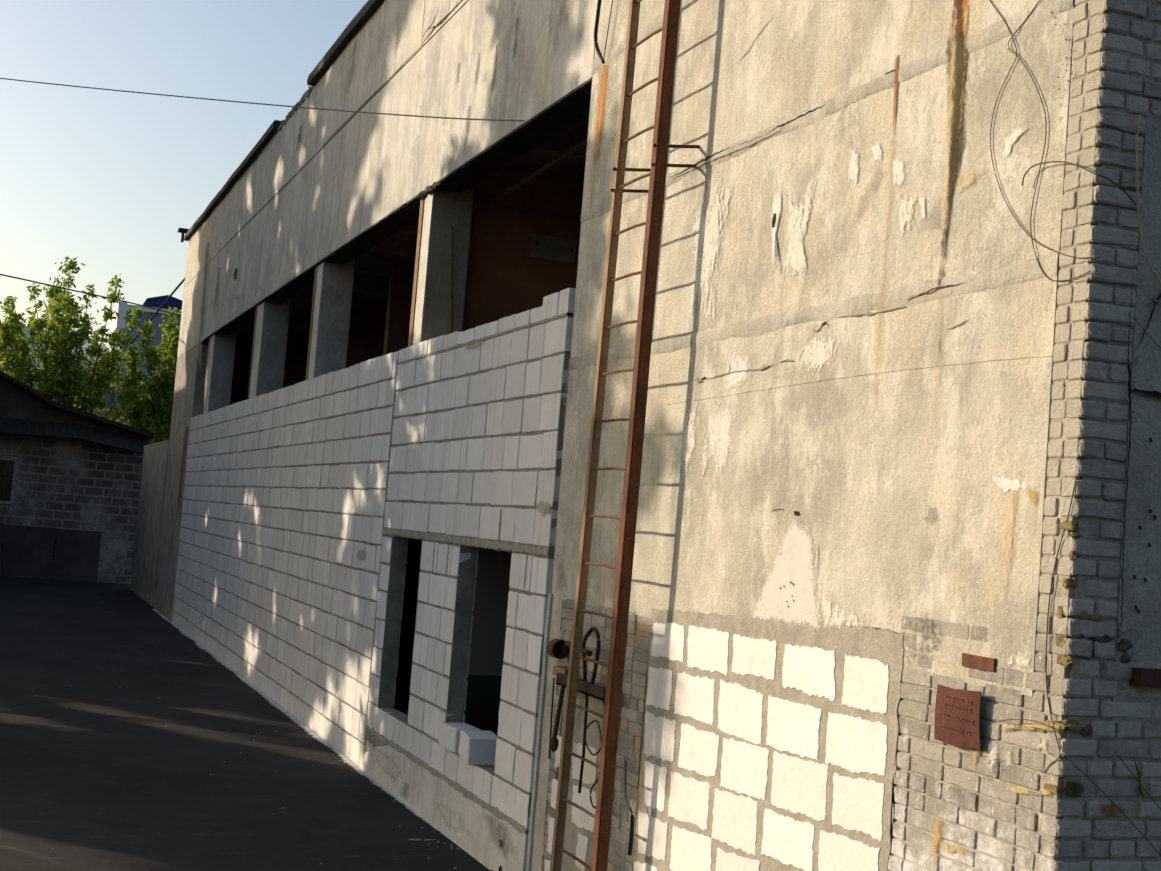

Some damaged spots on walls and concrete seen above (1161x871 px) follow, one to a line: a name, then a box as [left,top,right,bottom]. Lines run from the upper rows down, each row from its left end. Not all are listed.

rust [595,65,607,164]
crack [671,104,826,180]
peeling [848,150,859,184]
peeling [872,145,925,235]
rust [938,0,968,284]
peeling [771,181,815,277]
crack [907,283,963,301]
crack [693,359,794,383]
rust [932,819,969,856]